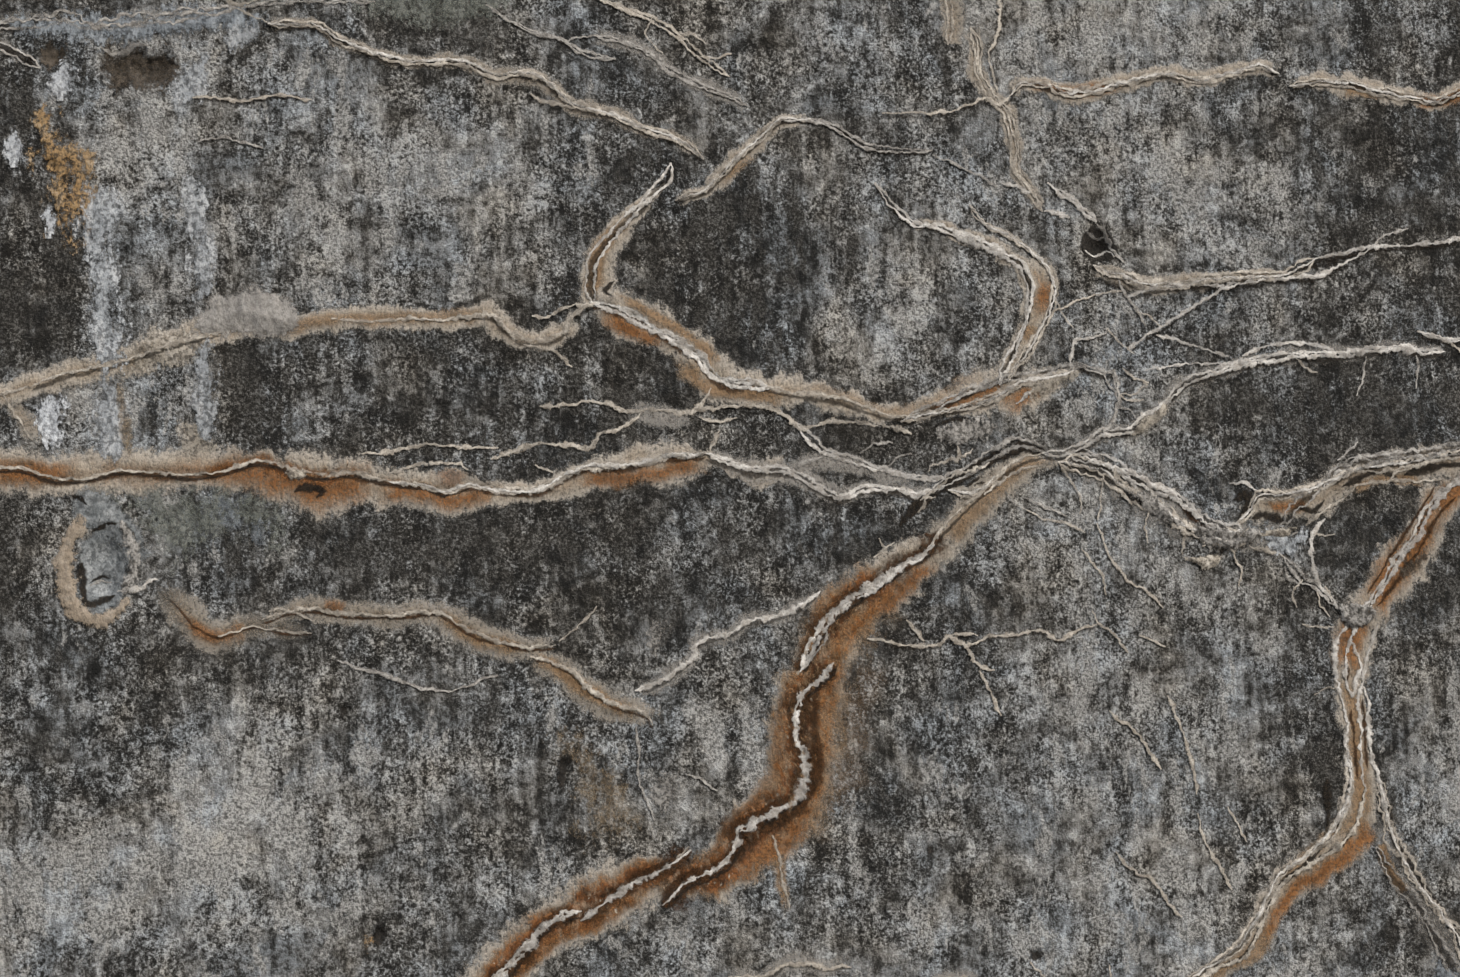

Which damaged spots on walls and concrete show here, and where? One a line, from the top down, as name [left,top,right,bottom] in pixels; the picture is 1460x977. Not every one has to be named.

rust [26,102,100,255]
crack [0,0,1281,222]
crack [1289,69,1460,112]
crack [0,316,267,441]
crack [274,163,1460,489]
crack [0,340,1460,977]